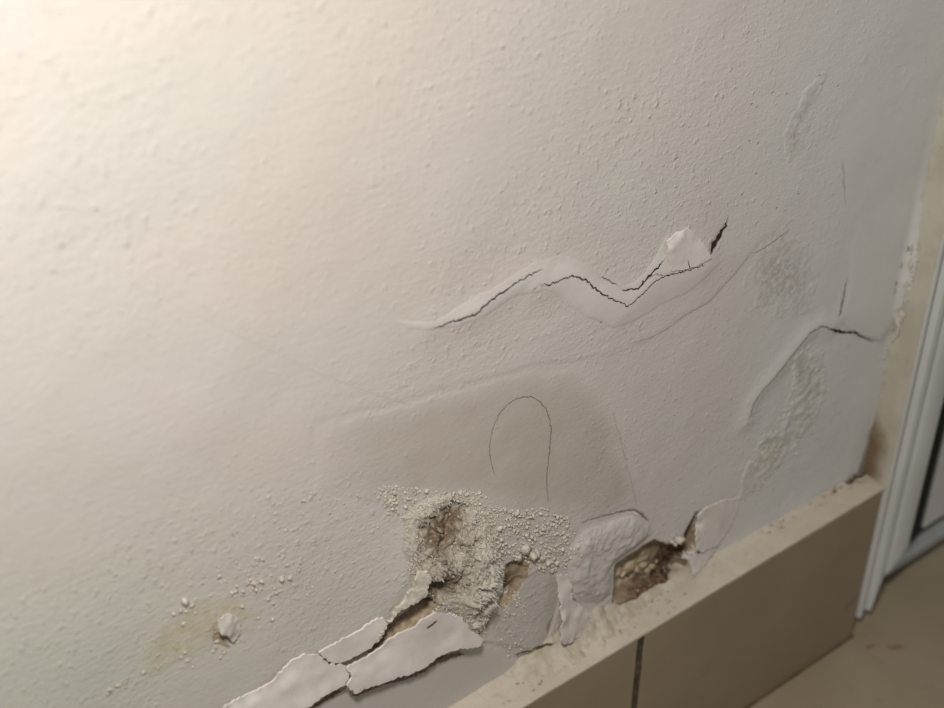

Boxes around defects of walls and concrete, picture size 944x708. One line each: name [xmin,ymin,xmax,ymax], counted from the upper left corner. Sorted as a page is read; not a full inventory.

crack [434,218,728,328]
crack [750,280,872,416]
peeling [170,558,292,660]
peeling [223,569,483,708]
spalling [486,507,590,658]
spalling [612,496,741,605]